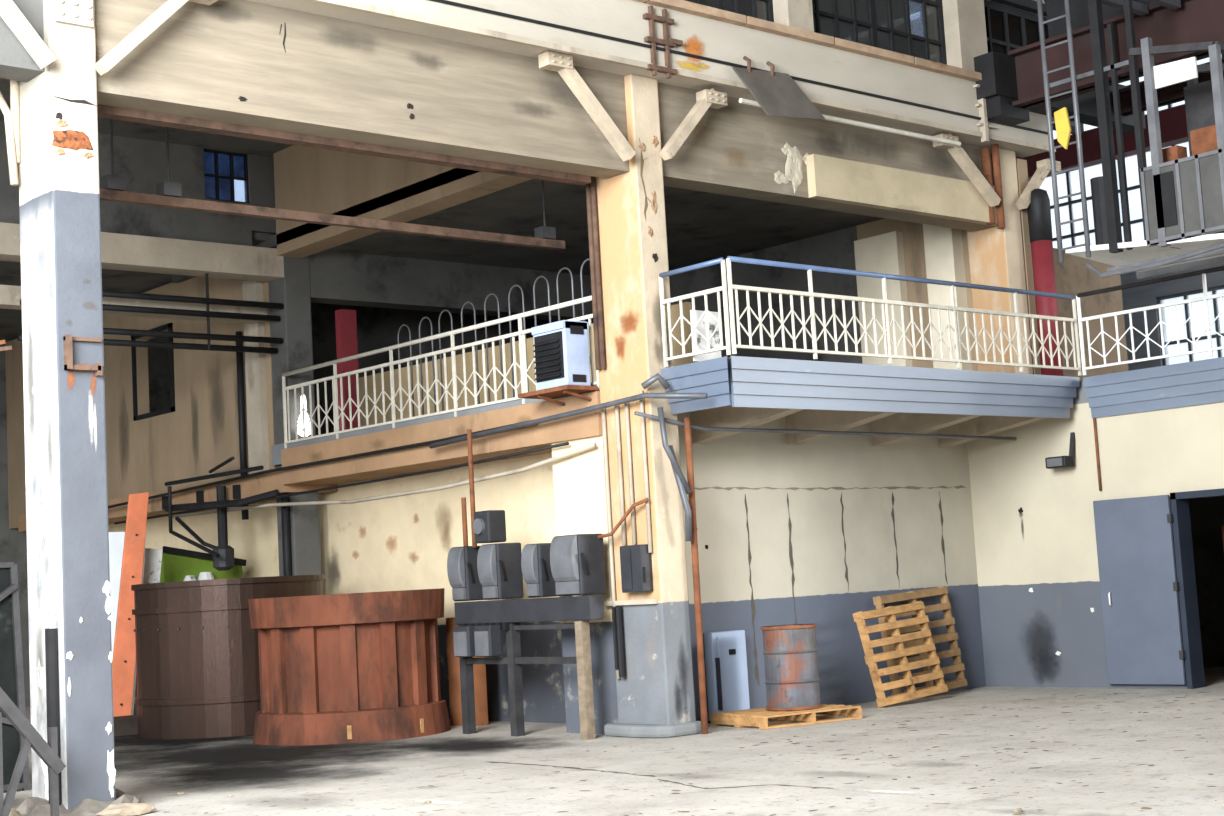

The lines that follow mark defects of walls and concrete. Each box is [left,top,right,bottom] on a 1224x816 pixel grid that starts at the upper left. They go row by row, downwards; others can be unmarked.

spalling [52,112,94,159]
spalling [774,142,809,193]
peeling [24,245,53,395]
peeling [27,446,57,628]
peeling [41,759,49,801]